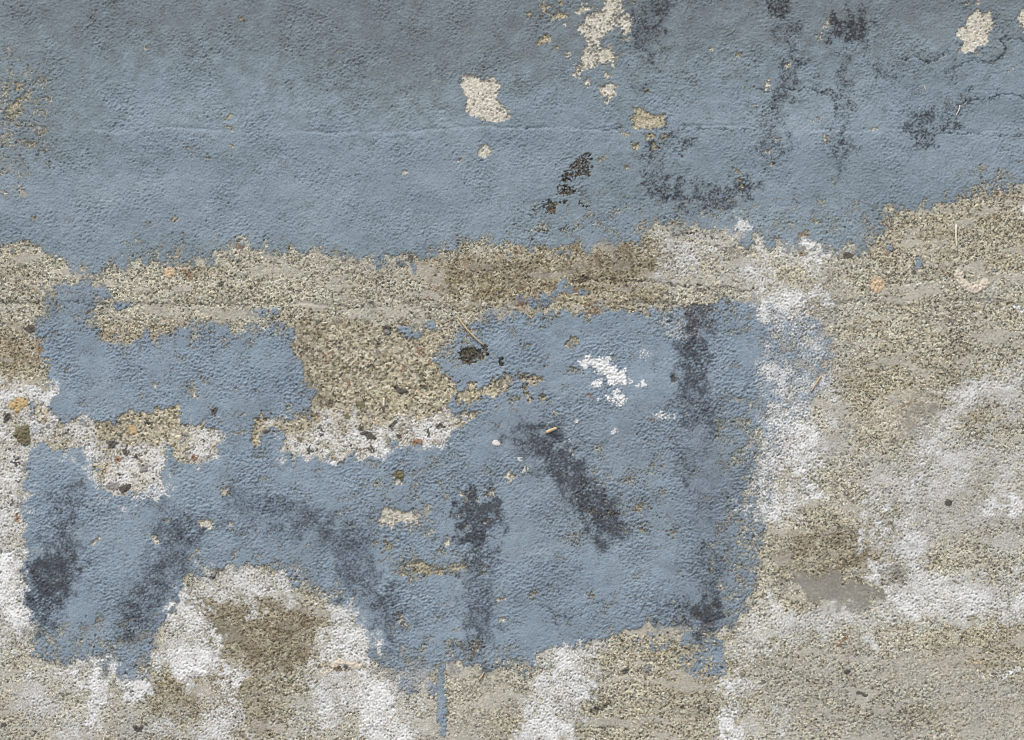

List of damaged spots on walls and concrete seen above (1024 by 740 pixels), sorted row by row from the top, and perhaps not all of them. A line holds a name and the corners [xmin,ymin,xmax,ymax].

peeling [460,71,512,123]
peeling [523,0,638,107]
peeling [955,0,994,56]
spalling [532,152,606,233]
water stain [0,373,226,679]
water stain [8,517,305,740]
peeling [0,314,548,497]
water stain [288,567,437,740]
water stain [517,424,623,551]
peeling [563,366,647,406]
water stain [637,123,855,528]
water stain [713,360,1024,740]